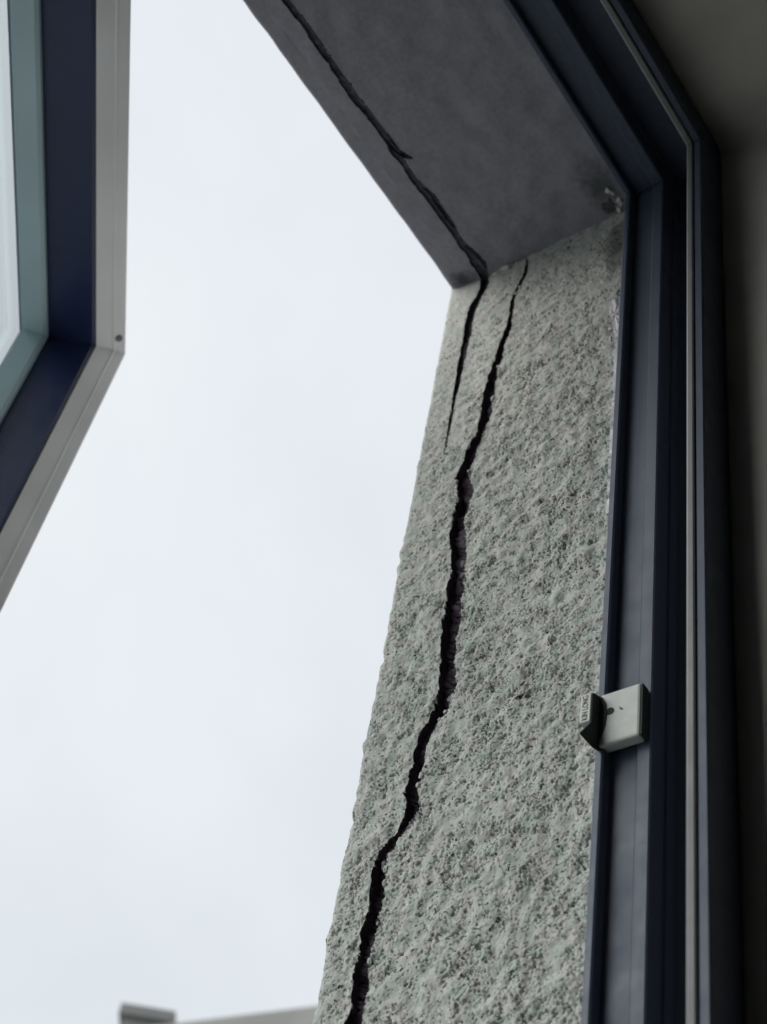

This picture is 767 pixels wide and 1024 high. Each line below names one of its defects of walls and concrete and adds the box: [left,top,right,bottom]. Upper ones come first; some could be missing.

crack [281,0,528,1024]